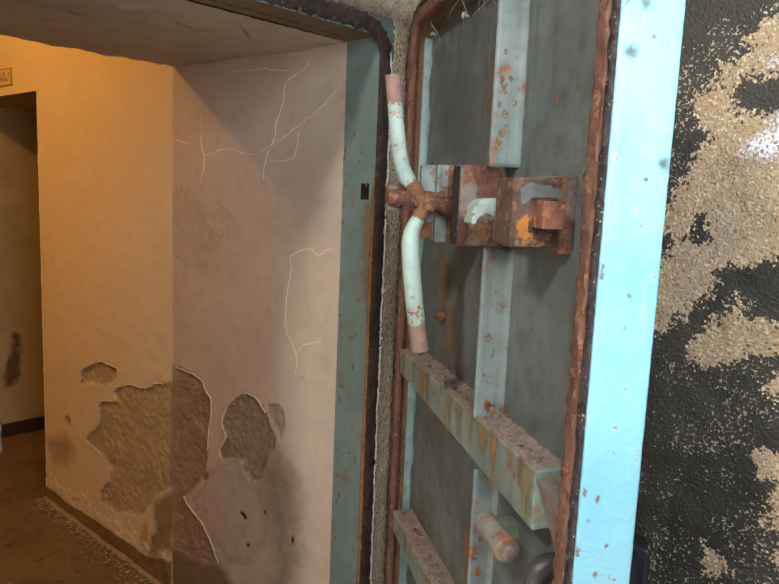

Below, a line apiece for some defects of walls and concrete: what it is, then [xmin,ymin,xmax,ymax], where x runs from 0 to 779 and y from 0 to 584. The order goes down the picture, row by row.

rust [473,164,503,198]
water stain [4,333,21,387]
crack [285,248,334,373]
rust [384,0,469,584]
rust [552,0,612,584]
spalling [79,360,285,565]
rust [446,394,497,482]